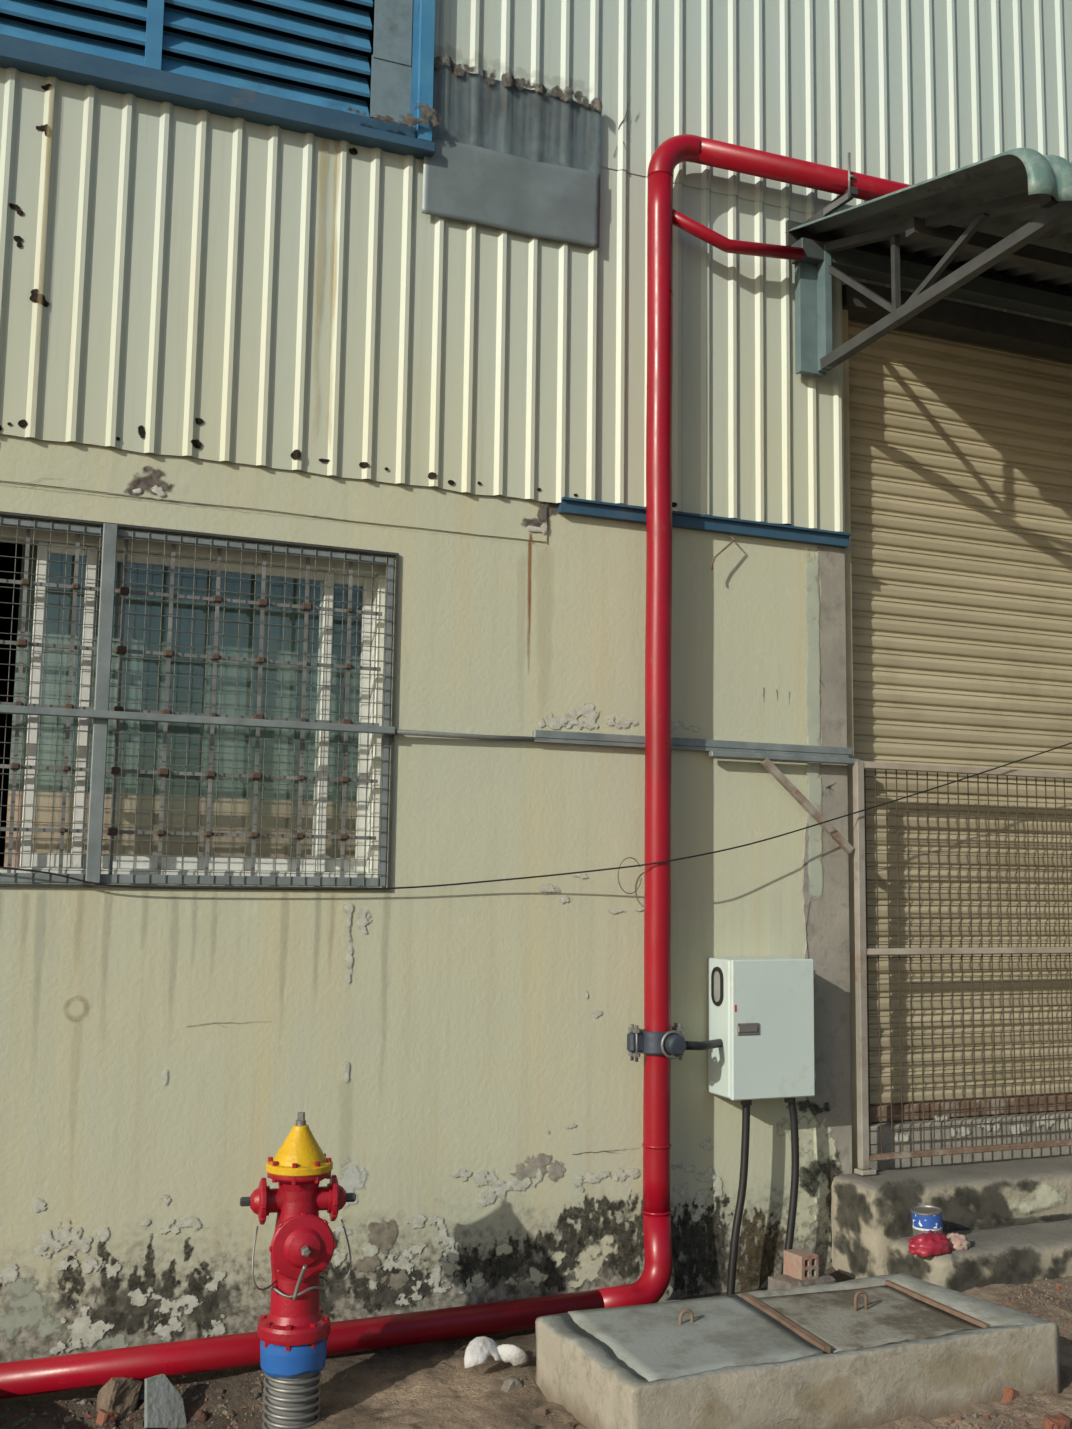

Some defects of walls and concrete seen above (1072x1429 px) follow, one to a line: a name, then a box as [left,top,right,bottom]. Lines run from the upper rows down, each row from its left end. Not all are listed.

leakage [58,1236,238,1339]
peeling [333,1159,618,1306]
leakage [320,1195,644,1318]
leakage [667,1188,786,1296]
leakage [799,1152,1072,1279]
leakage [947,1247,1072,1292]